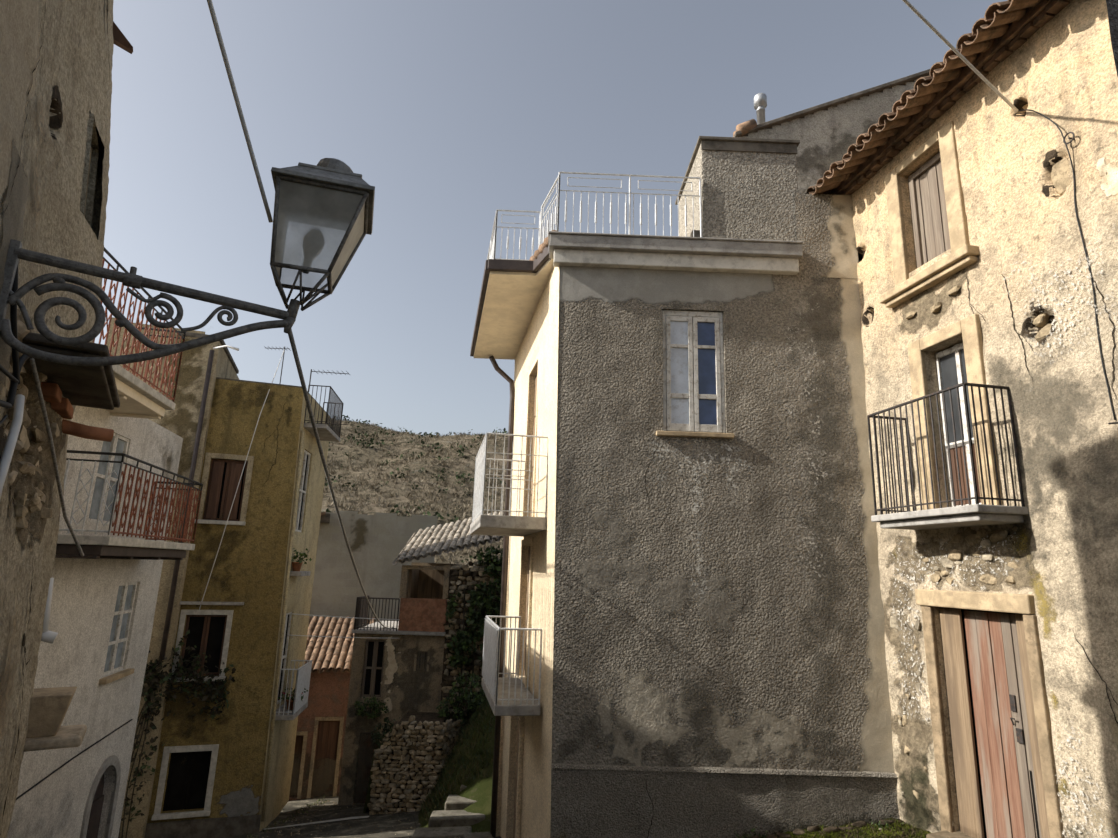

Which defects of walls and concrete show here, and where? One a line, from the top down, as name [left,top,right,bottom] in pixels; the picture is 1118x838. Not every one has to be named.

hole [1042,149,1071,197]
crack [966,266,1033,382]
hole [1021,302,1055,344]
flaking render [883,524,1039,828]
crack [1074,634,1118,724]